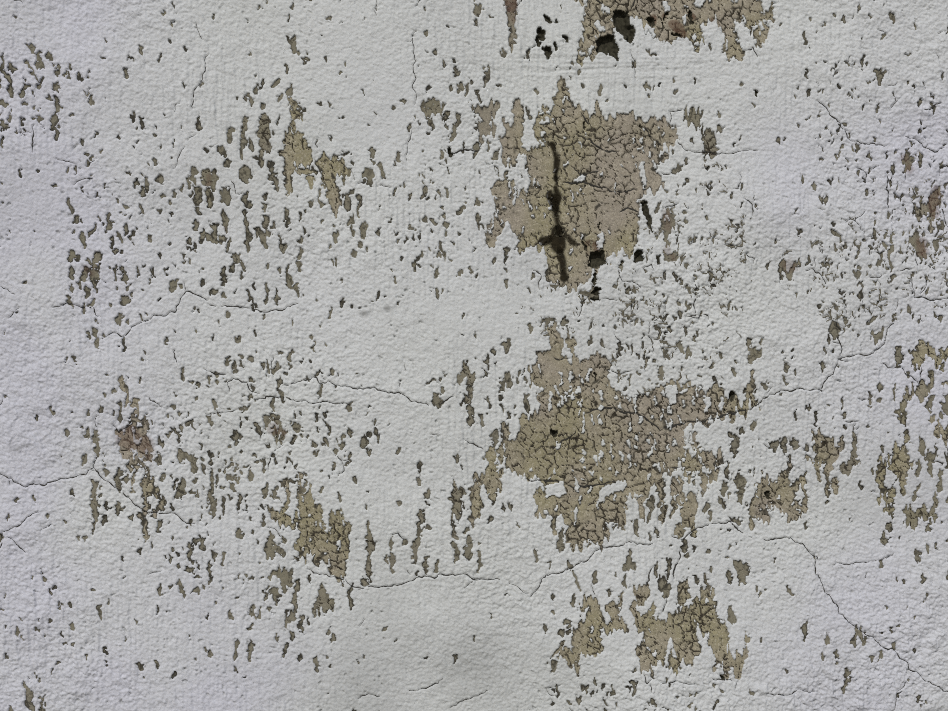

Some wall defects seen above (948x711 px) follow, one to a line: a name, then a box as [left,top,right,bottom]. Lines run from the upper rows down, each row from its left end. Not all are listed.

peeling [0,43,106,149]
peeling [286,36,310,65]
peeling [794,55,941,124]
damp [539,142,576,281]
crack [227,377,428,405]
peeling [393,0,872,711]
crack [1,456,195,524]
peeling [65,298,390,678]
peeling [384,461,439,576]
peeling [31,569,72,610]
crack [309,521,948,710]